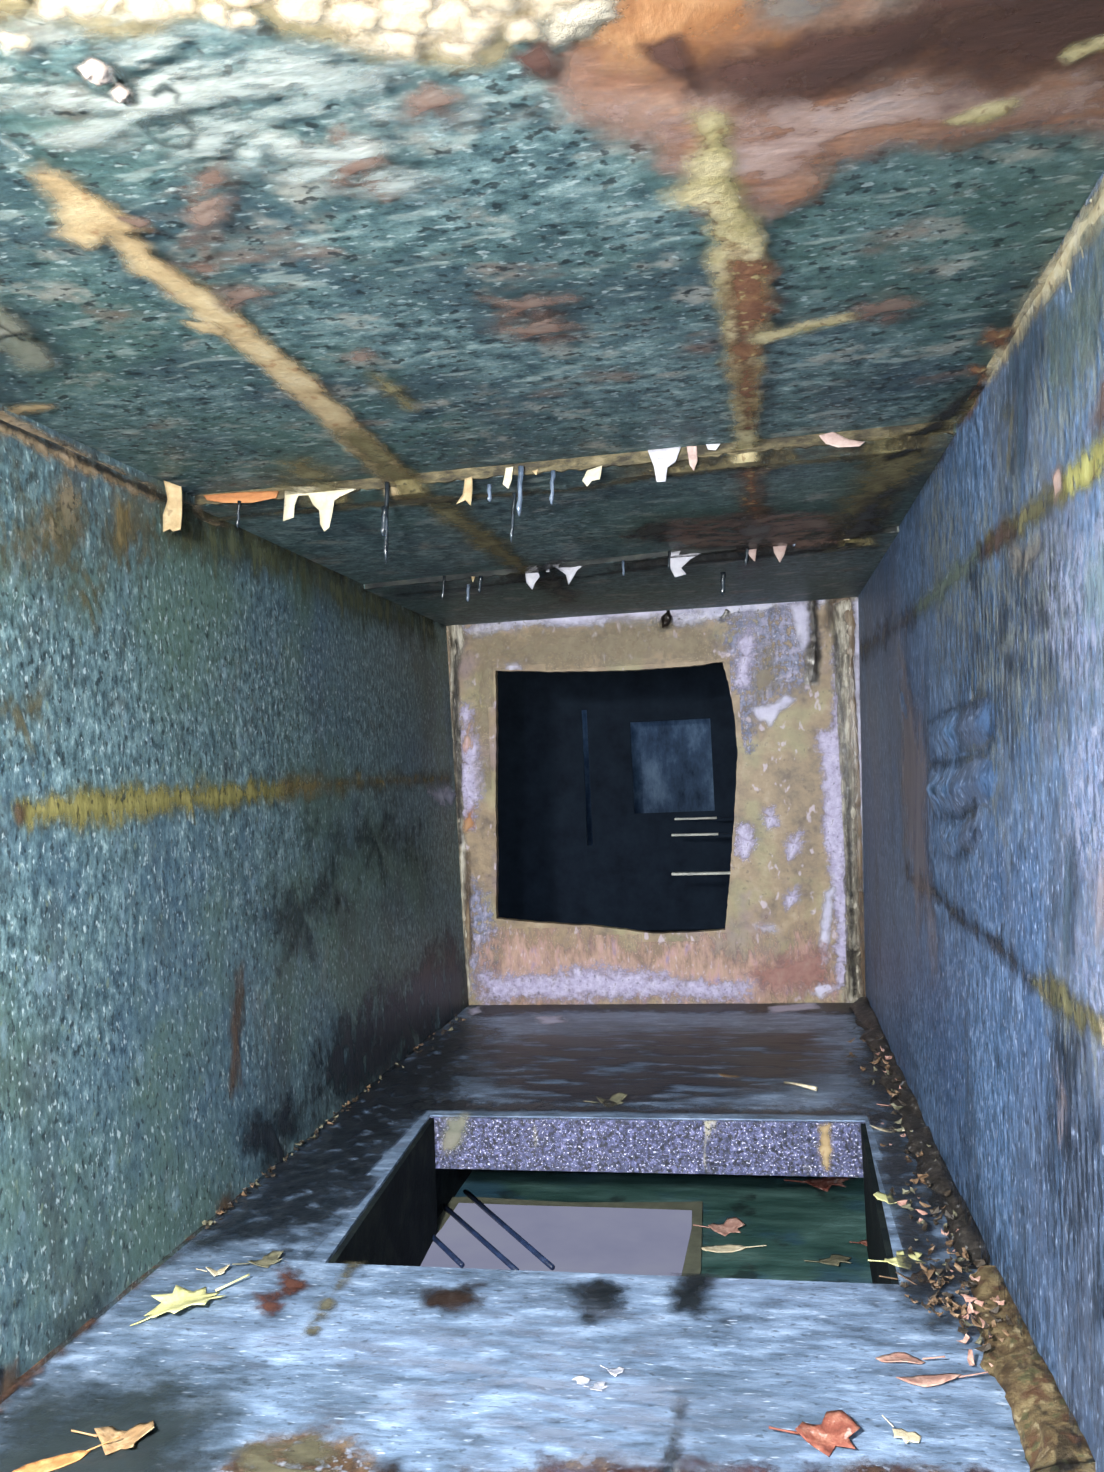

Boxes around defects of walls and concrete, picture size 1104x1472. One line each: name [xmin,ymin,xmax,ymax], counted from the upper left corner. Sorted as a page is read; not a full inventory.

peeling [0,0,581,67]
rust [514,0,1104,212]
rust [274,127,416,201]
rust [182,168,226,276]
rust [222,286,271,309]
rust [490,295,575,343]
peeling [648,444,720,482]
peeling [283,487,356,532]
peeling [525,566,582,590]
peeling [670,551,701,577]
peeling [462,600,848,1001]
damp [0,1366,229,1472]